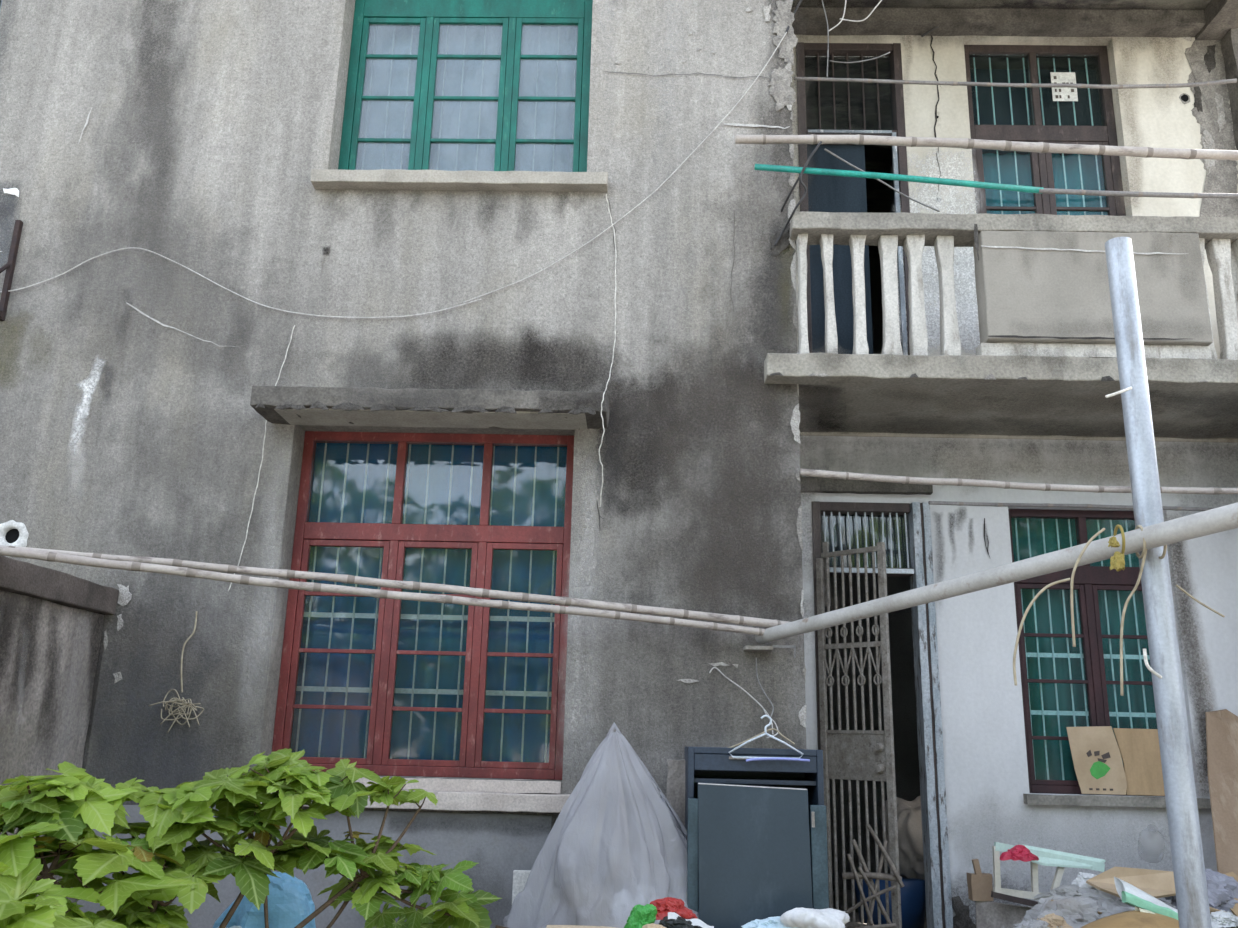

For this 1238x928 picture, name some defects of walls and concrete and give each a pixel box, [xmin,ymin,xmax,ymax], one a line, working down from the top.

spalling [746,0,798,333]
crack [930,35,941,195]
flaking render [1179,37,1238,217]
spalling [790,373,829,444]
water stain [349,334,806,618]
water stain [0,597,37,700]
water stain [43,633,57,714]
water stain [89,616,103,732]
flaking render [103,584,132,650]
spalling [798,704,807,728]